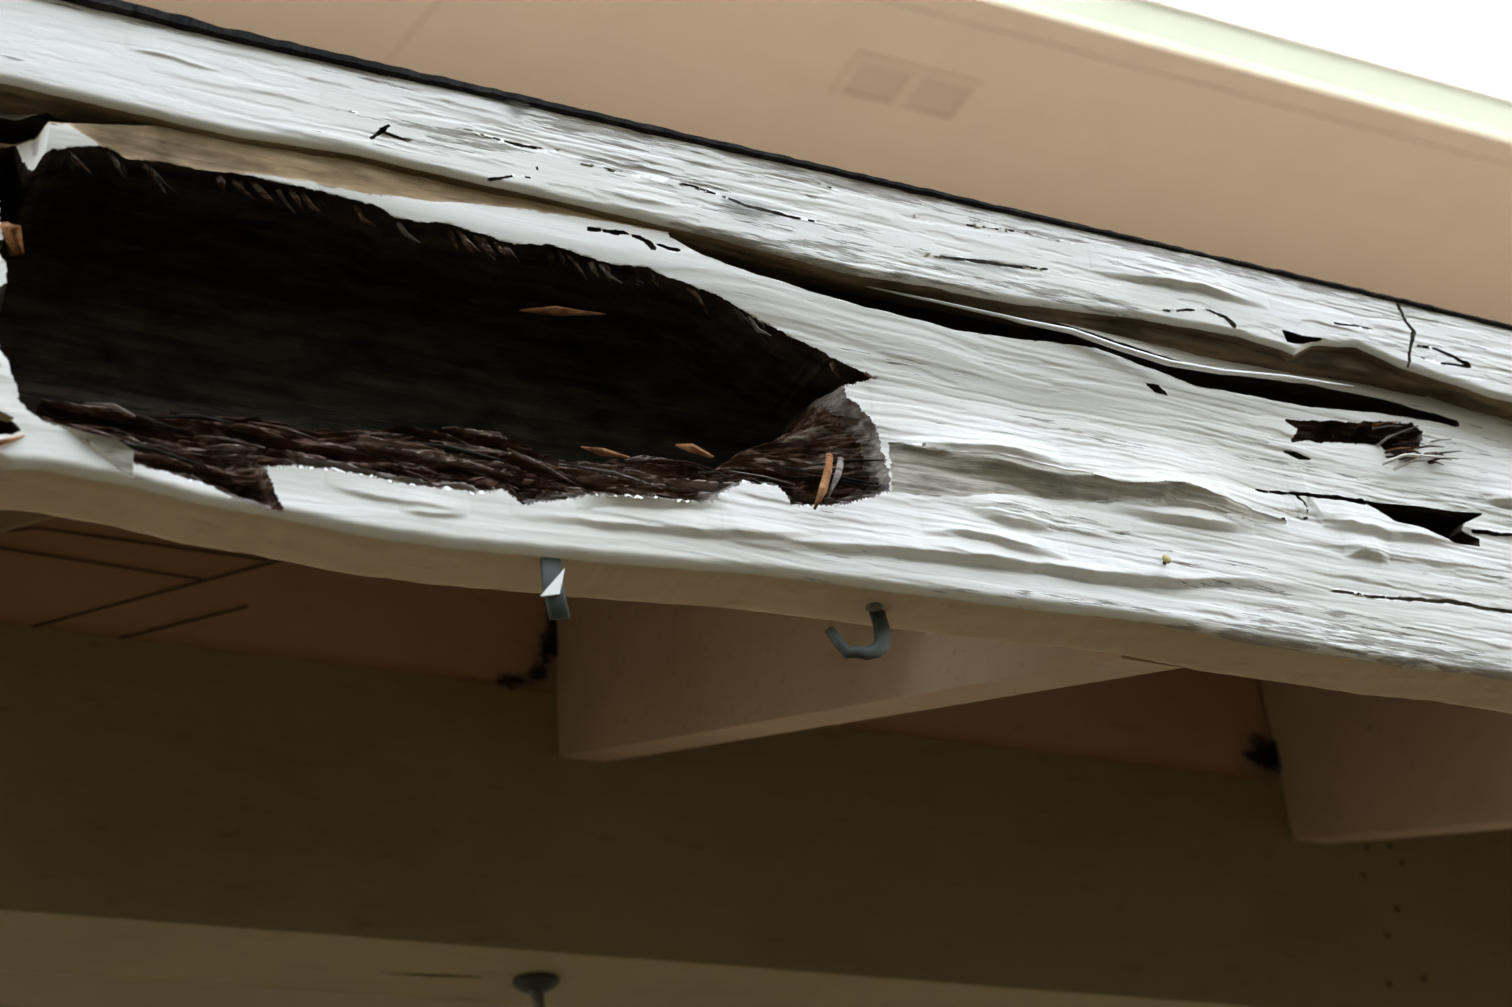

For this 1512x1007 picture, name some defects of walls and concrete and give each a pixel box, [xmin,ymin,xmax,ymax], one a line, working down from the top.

spalling [0,122,871,472]
crack [1162,308,1237,328]
crack [1333,303,1471,368]
peeling [219,490,281,509]
crack [1255,489,1512,547]
crack [1331,590,1512,614]